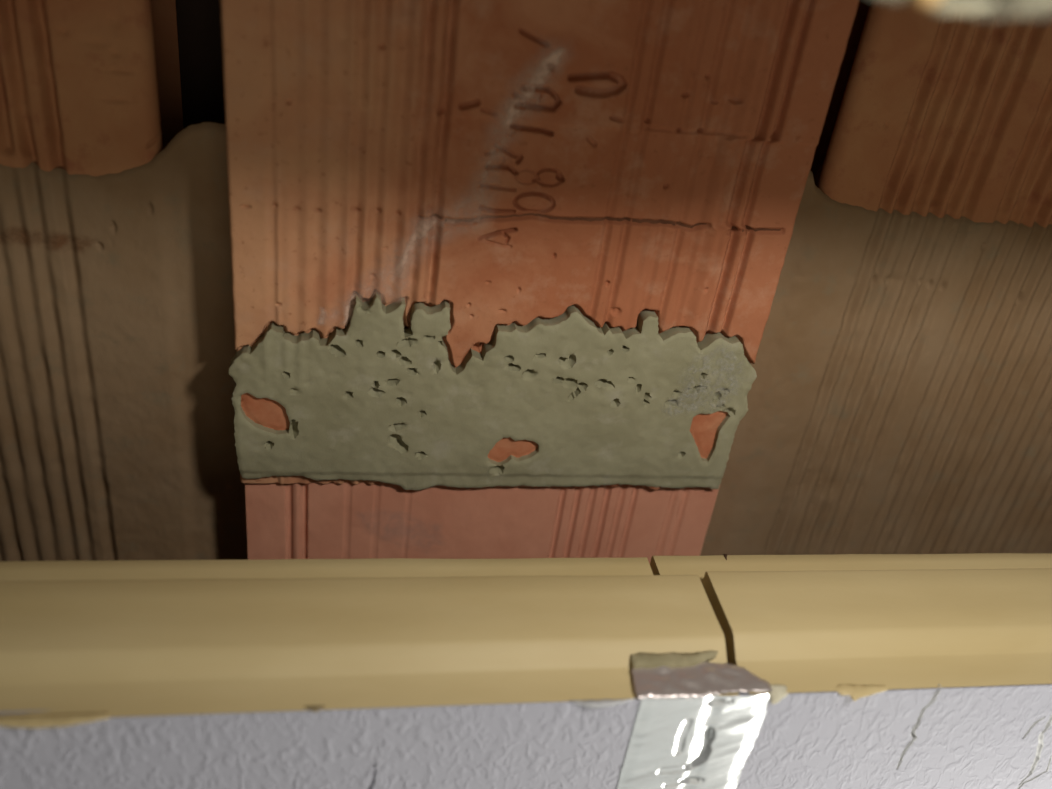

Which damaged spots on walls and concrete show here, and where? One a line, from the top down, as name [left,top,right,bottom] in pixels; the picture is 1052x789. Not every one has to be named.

spalling [241,393,290,430]
spalling [488,437,538,462]
spalling [690,411,728,459]
crack [897,684,942,770]
crack [1017,715,1052,789]